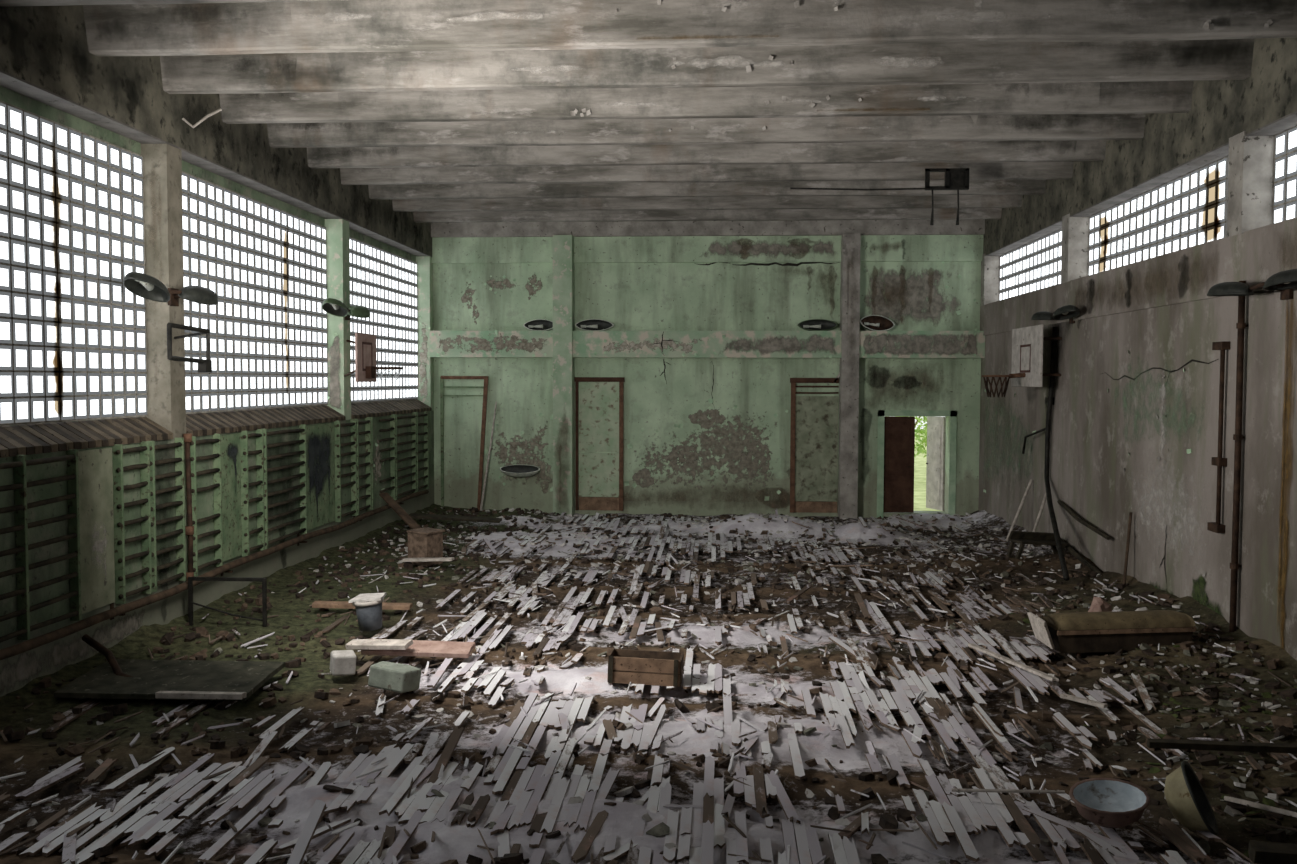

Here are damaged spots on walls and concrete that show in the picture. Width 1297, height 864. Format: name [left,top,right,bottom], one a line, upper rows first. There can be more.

peeling [417,275,551,398]
peeling [594,332,837,358]
peeling [860,262,980,356]
peeling [624,398,788,501]